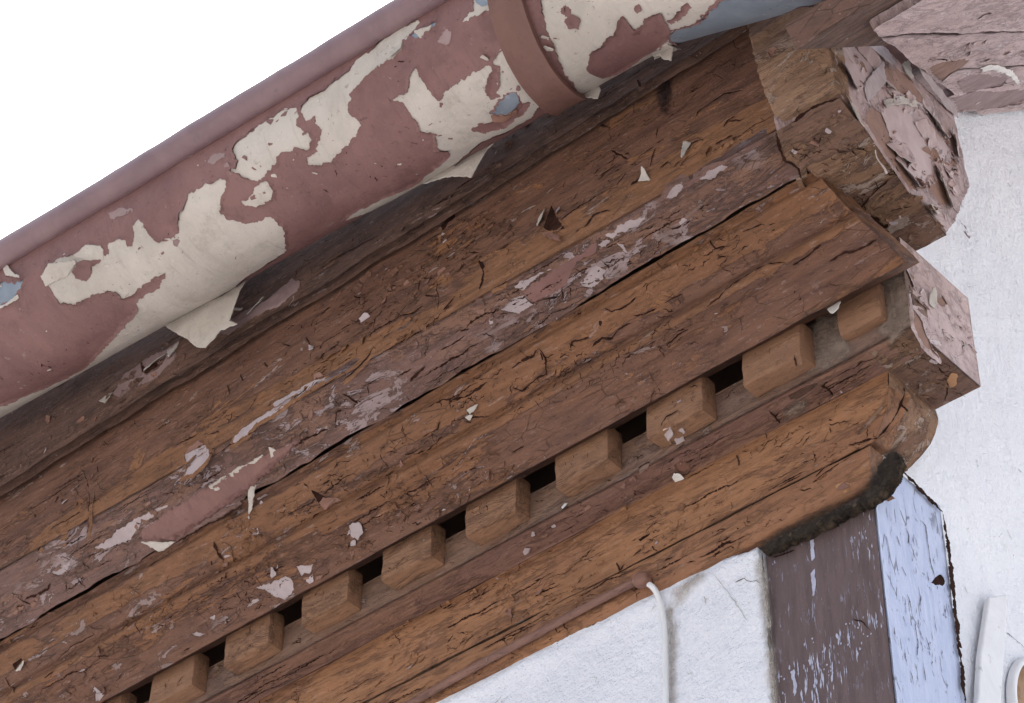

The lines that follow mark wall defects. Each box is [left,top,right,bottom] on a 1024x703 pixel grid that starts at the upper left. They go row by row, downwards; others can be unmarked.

peeling [0,0,490,418]
peeling [341,44,541,222]
crack [144,56,958,572]
peeling [481,207,652,330]
peeling [536,0,824,94]
peeling [841,46,1024,215]
crack [10,422,135,682]
peeling [92,436,302,553]
crack [122,501,299,657]
peeling [229,372,329,449]
crack [393,269,976,703]
mould [760,449,900,552]